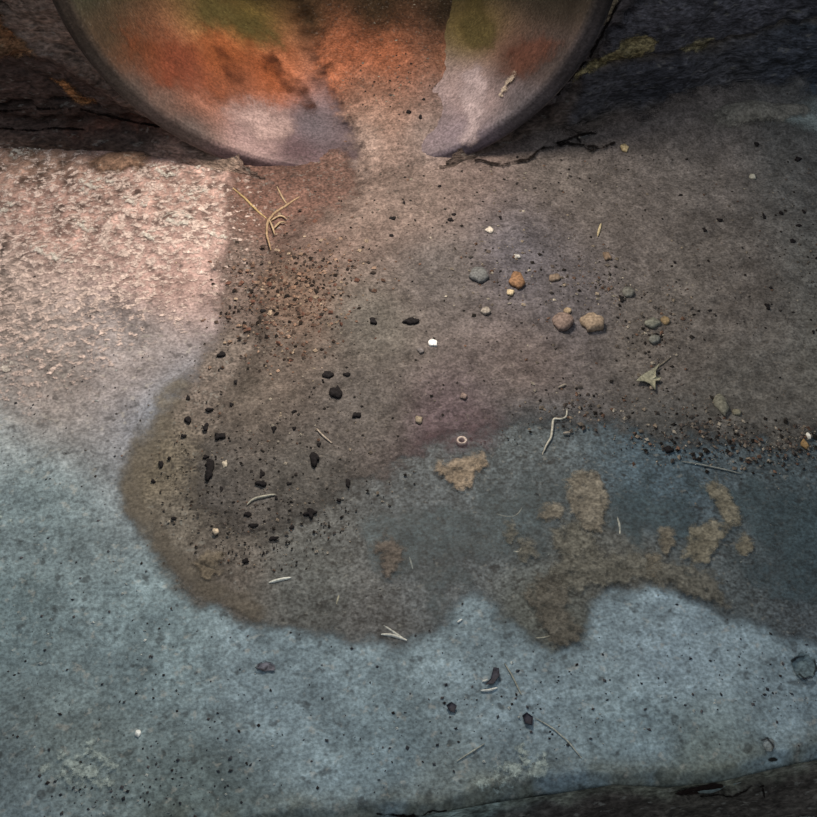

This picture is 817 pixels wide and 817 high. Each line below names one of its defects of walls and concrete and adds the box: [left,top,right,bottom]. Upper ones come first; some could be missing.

rust [52,79,94,104]
crack [474,132,615,166]
water stain [0,147,817,652]
efflorescence [57,739,119,789]
efflorescence [472,743,548,794]